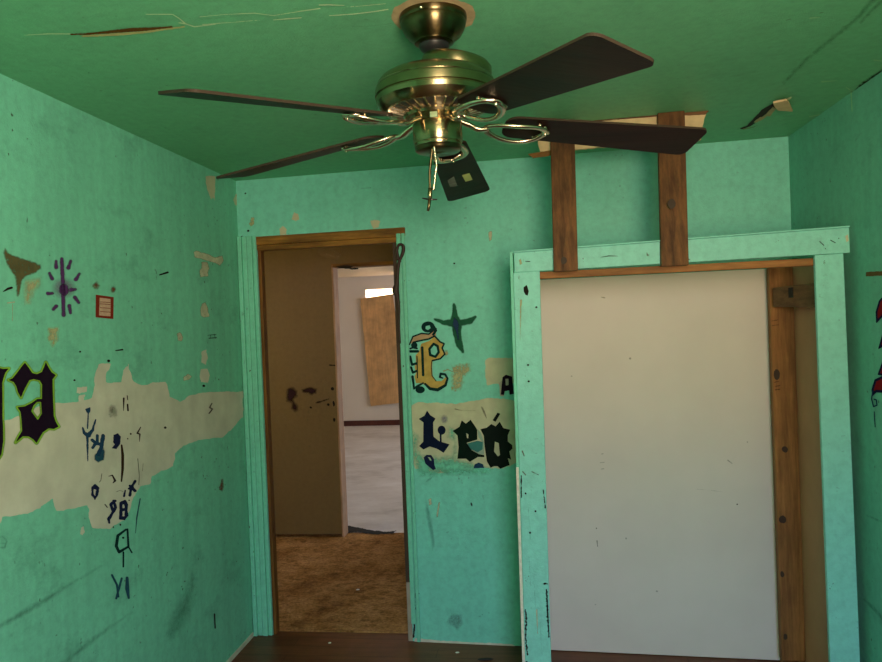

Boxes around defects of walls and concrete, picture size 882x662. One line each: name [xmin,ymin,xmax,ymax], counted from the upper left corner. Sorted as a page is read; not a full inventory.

crack [31,3,388,37]
peeling [443,364,469,391]
peeling [485,358,514,385]
peeling [0,350,244,535]
peeling [412,398,516,474]